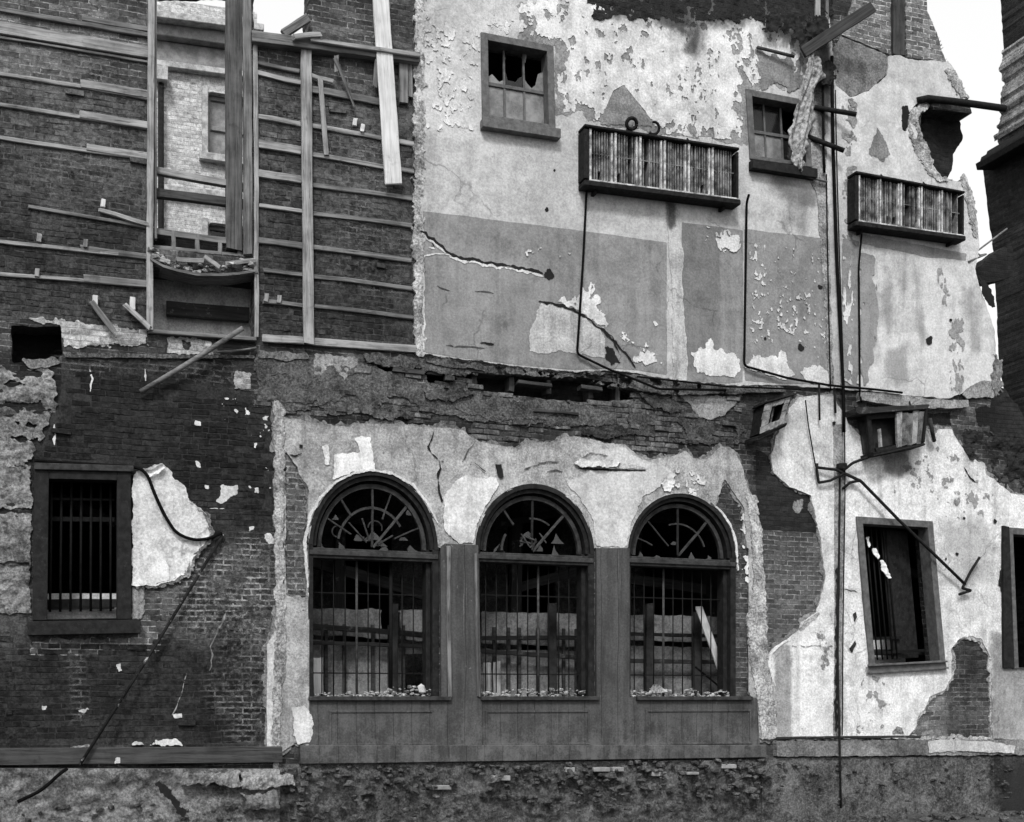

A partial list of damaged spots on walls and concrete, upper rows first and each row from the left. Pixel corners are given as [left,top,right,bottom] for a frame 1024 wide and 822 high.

peeling [425,0,835,146]
spalling [901,102,978,238]
spalling [0,356,60,615]
spalling [363,352,478,378]
crack [427,431,486,502]
crack [420,230,636,373]
spalling [605,346,620,365]
peeling [691,226,829,384]
spalling [906,318,1024,521]
spalling [856,636,994,740]